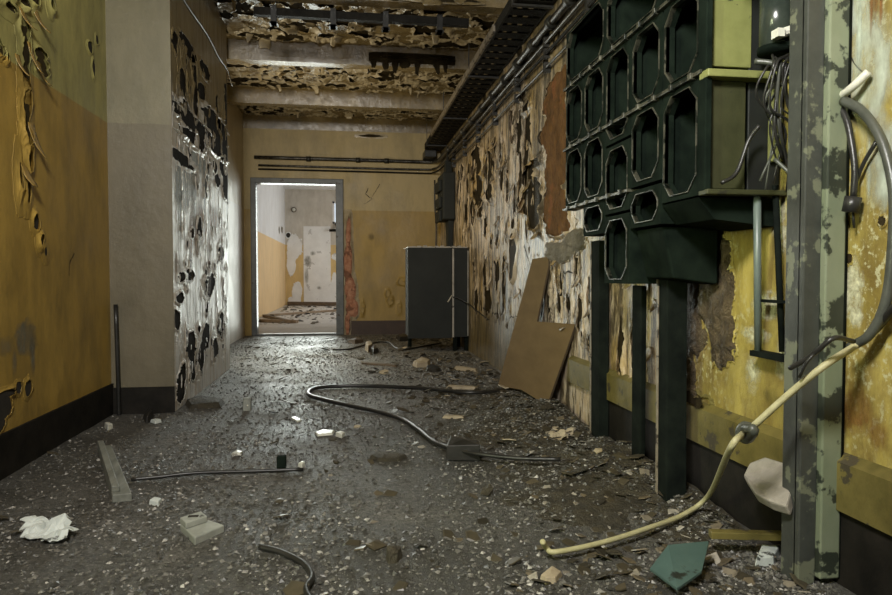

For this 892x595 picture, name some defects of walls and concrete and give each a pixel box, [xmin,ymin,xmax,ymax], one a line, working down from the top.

peeling [171,0,499,405]
flaking render [456,1,605,356]
peeling [687,232,739,408]